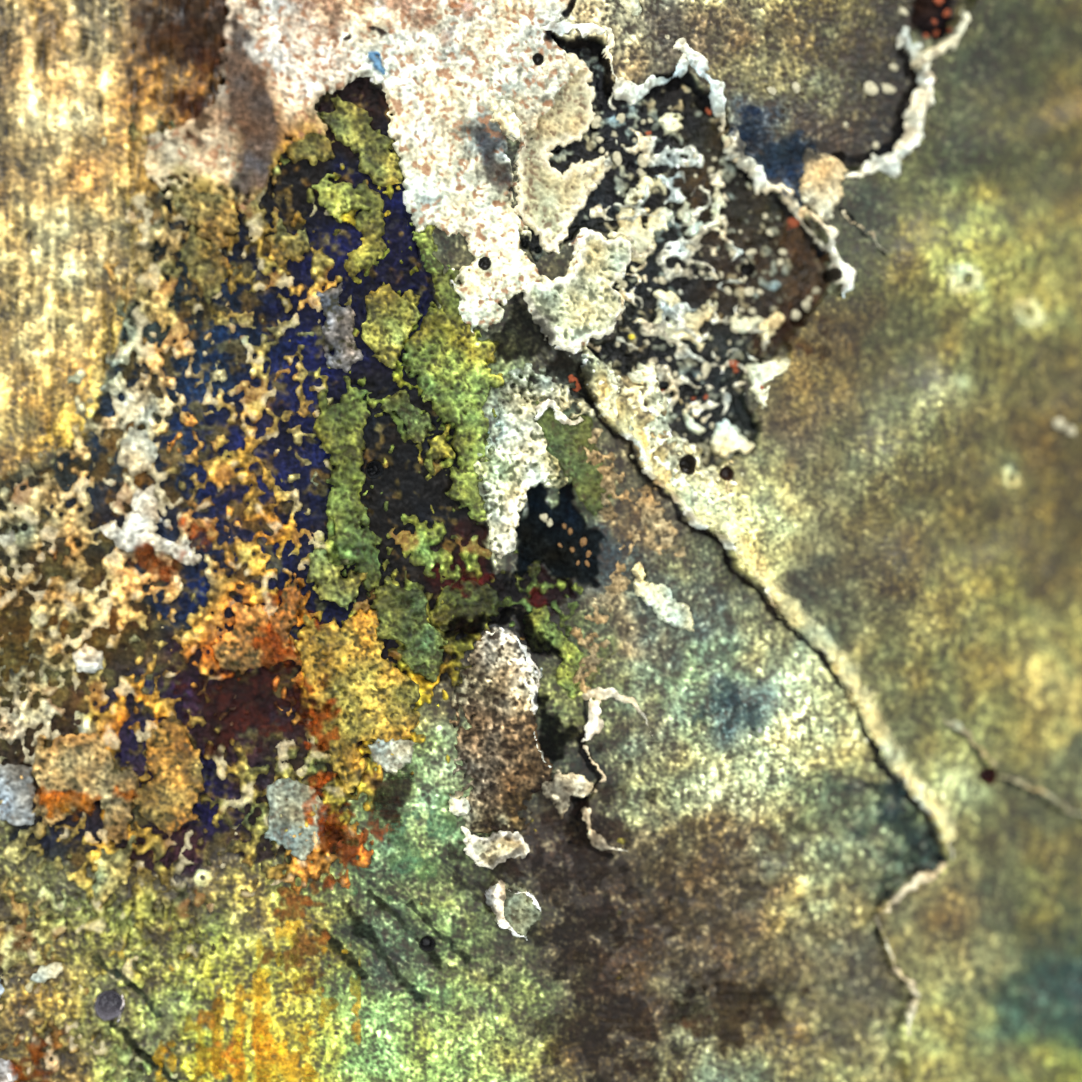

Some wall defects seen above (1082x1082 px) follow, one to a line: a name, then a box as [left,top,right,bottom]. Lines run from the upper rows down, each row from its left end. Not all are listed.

spalling [911,0,954,42]
peeling [143,0,848,470]
peeling [0,530,16,550]
peeling [100,427,202,565]
peeling [473,363,611,587]
peeling [72,643,104,673]
crack [576,359,956,1036]
peeling [0,763,36,826]
peeling [264,778,328,861]
peeling [368,738,415,776]
peeling [448,626,598,940]
crack [941,719,1082,820]